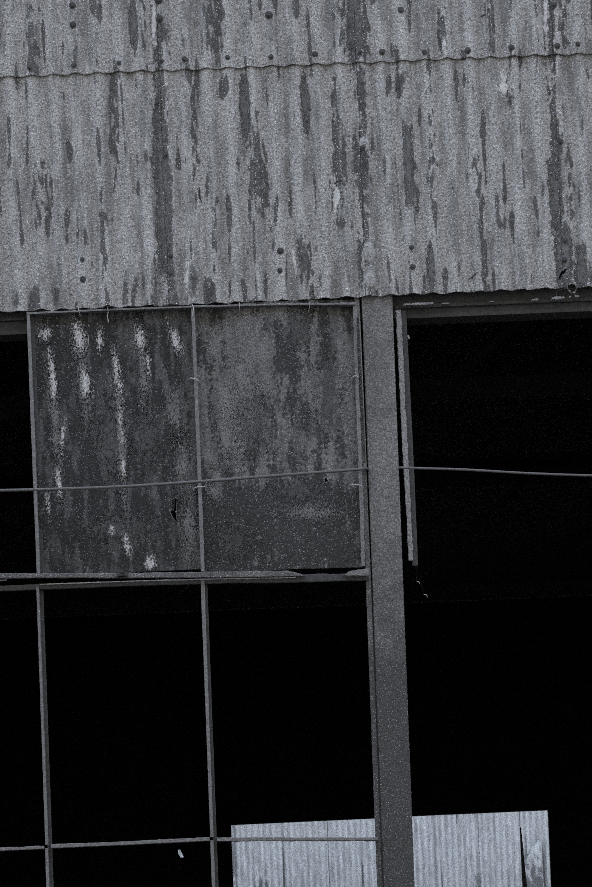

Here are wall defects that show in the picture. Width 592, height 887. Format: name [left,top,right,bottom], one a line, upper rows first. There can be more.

corrosion [92,391,158,491]